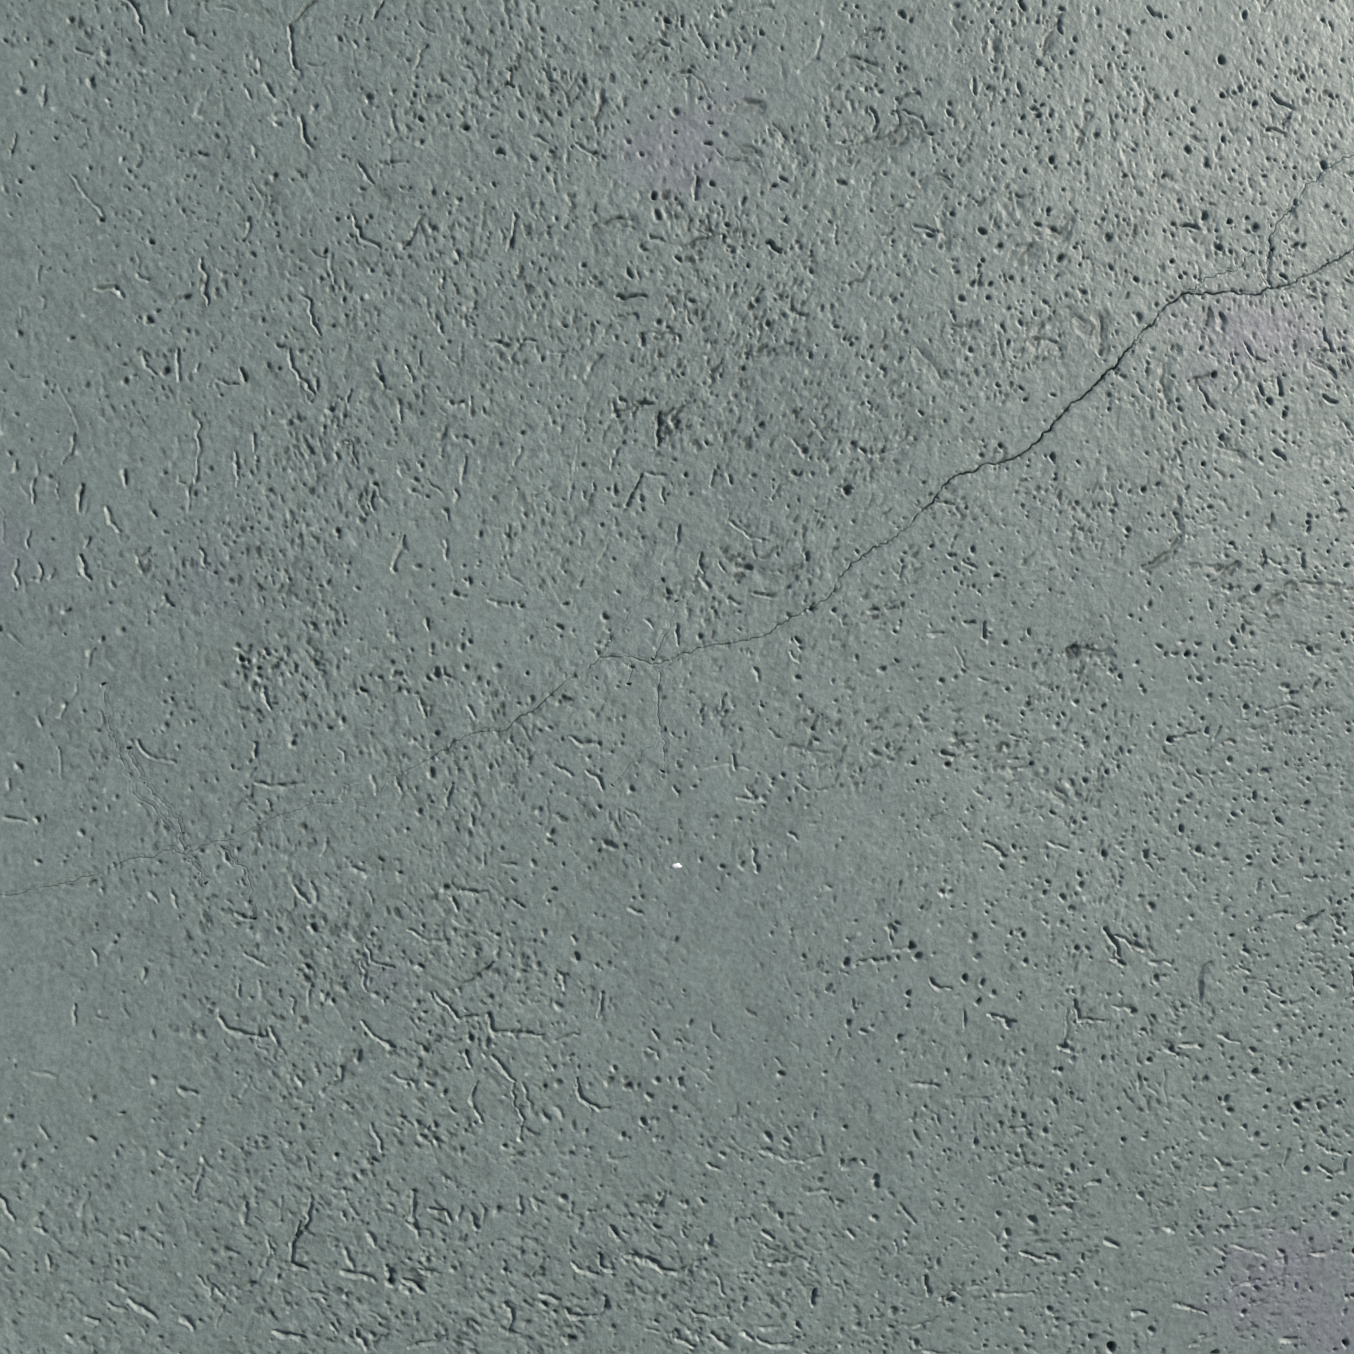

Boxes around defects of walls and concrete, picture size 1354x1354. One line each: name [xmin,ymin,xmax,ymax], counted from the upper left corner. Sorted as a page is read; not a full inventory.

crack [0,152,1354,919]